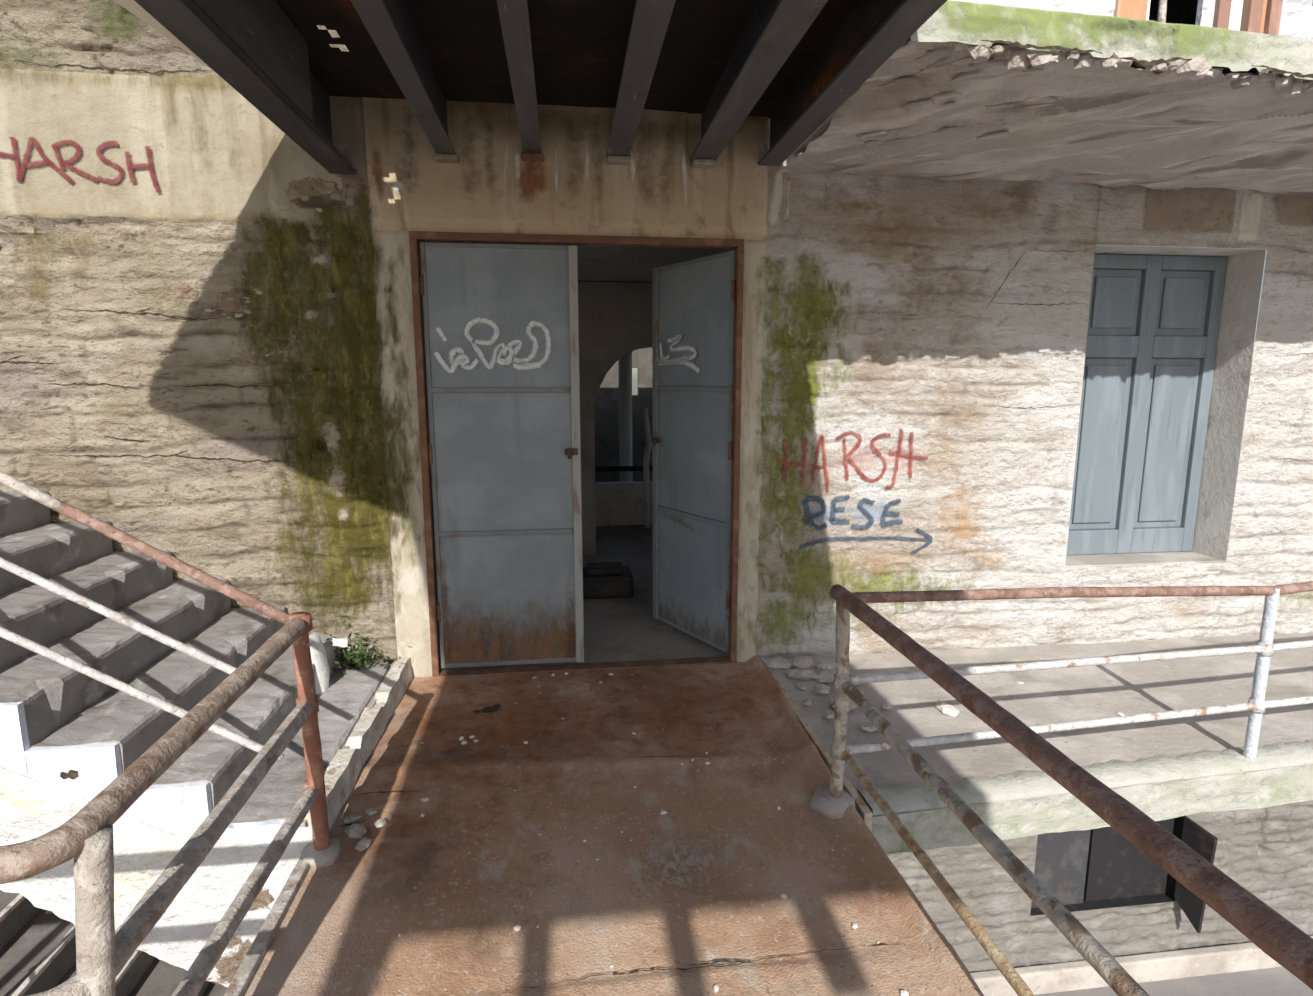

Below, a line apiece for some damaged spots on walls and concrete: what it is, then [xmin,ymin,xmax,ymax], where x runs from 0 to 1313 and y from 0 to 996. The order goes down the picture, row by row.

spalling [951,40,1313,98]
corrosion [443,616,576,664]
crack [505,943,894,992]